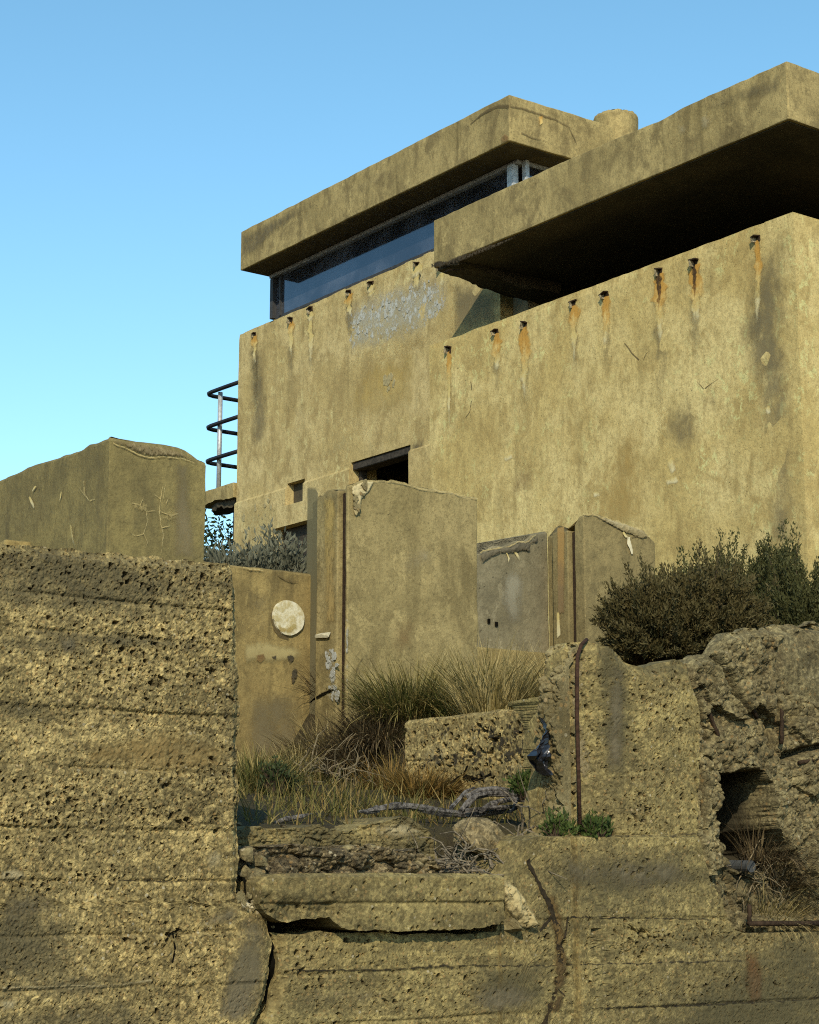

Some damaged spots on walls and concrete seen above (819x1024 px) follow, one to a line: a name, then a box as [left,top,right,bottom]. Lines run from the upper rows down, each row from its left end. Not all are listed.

crack [470,104,576,141]
peeling [349,280,444,346]
corrosion [651,272,667,337]
corrosion [688,263,703,318]
corrosion [754,240,763,315]
corrosion [518,327,532,392]
crack [132,487,174,543]
spalling [352,479,478,515]
spalling [480,537,538,562]
spalling [679,621,819,932]
crack [238,846,268,895]
crack [253,859,741,1024]